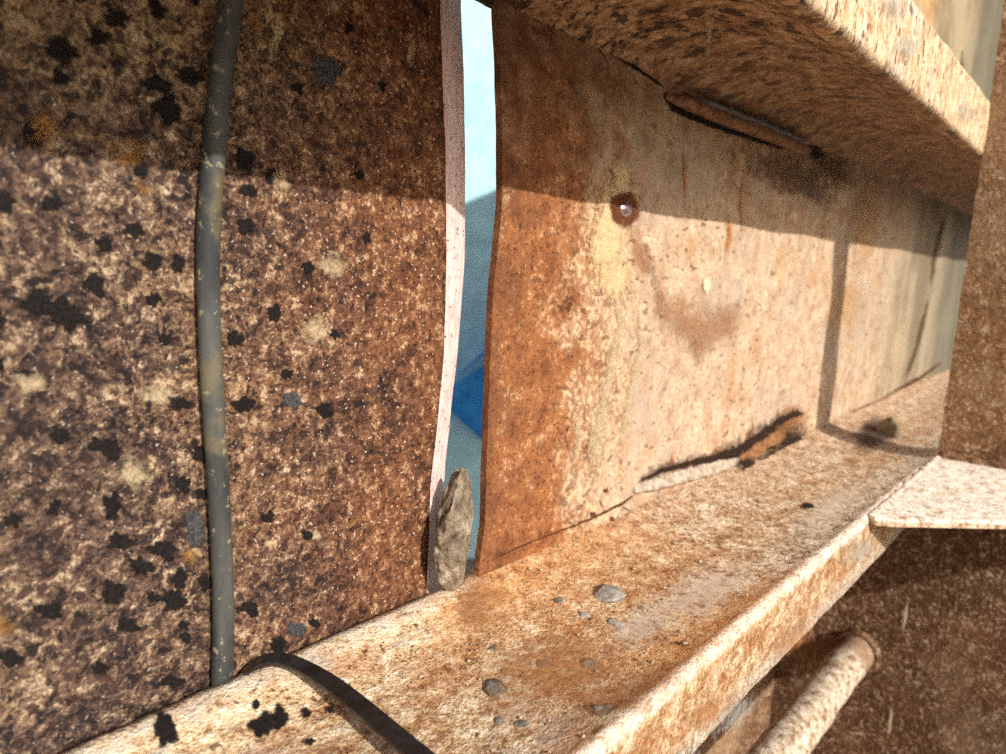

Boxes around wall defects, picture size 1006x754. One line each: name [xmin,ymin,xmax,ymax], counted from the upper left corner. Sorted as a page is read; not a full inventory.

rust [610,192,640,227]
crack [491,494,633,561]